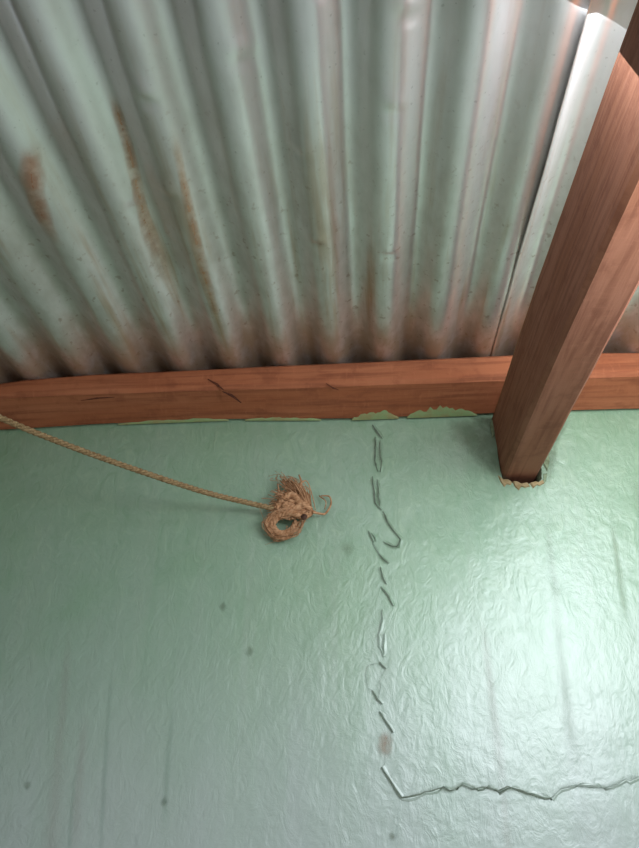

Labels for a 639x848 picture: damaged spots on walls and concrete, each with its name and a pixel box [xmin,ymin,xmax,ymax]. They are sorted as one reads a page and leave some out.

spalling [498,454,550,490]
crack [365,424,403,733]
crack [381,760,639,802]